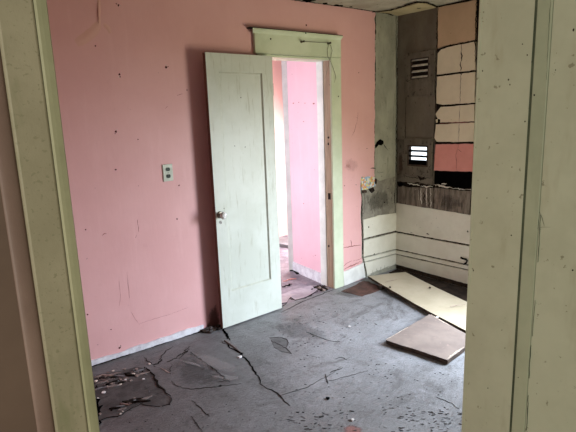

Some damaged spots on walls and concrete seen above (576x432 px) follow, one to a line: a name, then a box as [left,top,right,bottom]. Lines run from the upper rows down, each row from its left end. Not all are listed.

peeling [94,363,151,399]
crack [222,328,365,406]
peeling [109,396,152,415]